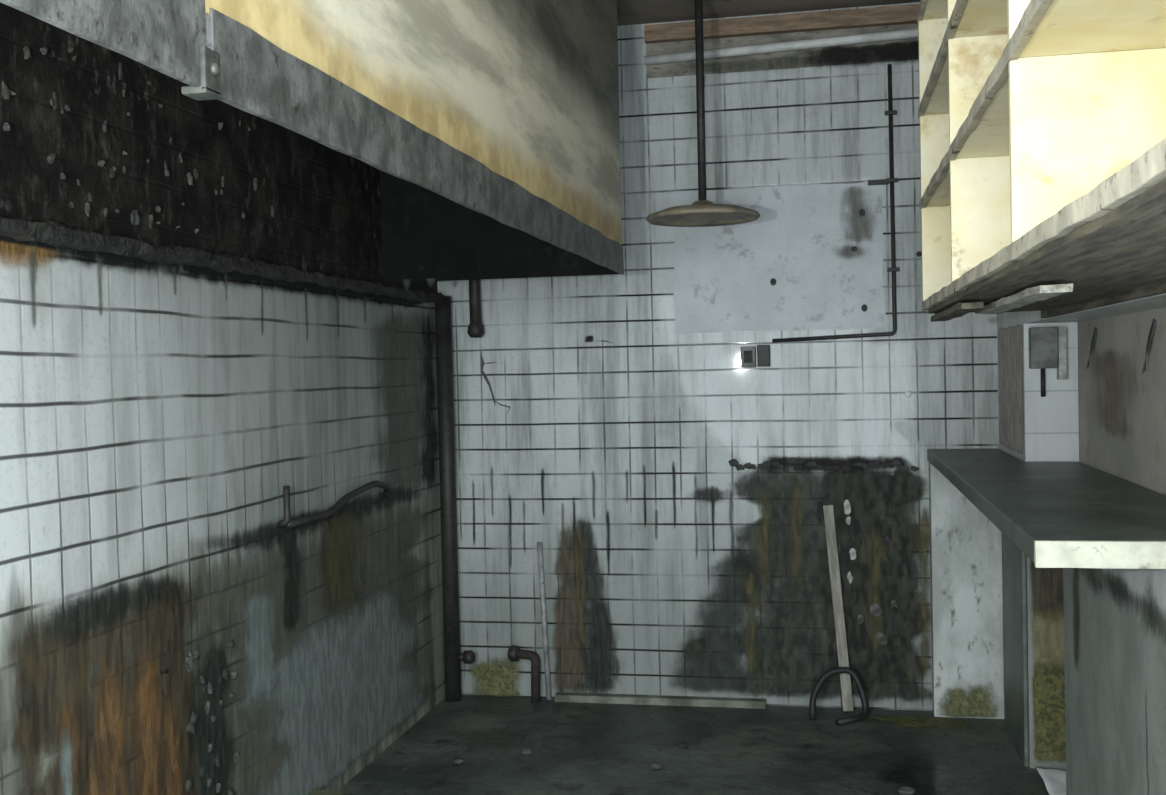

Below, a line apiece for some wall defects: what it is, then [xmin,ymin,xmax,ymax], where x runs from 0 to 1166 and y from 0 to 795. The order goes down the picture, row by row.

rust [14,579,196,795]
leakage [509,496,525,565]
leakage [555,474,618,693]
leakage [643,469,657,537]
leakage [677,457,932,701]